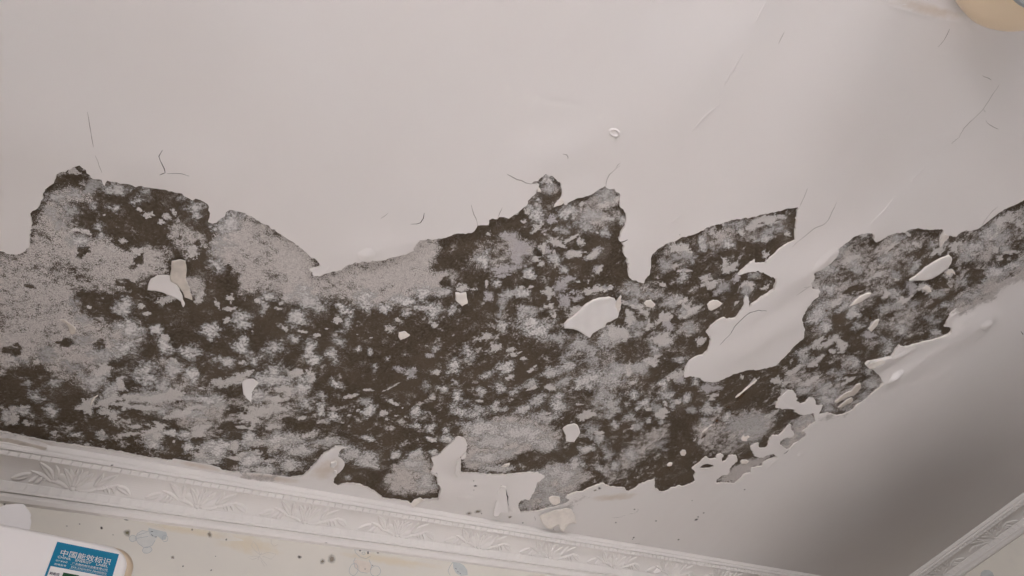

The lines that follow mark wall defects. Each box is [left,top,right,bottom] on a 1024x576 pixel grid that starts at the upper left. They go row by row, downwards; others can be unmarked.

peeling [0,166,1024,532]
leakage [20,436,66,448]
leakage [168,456,345,484]